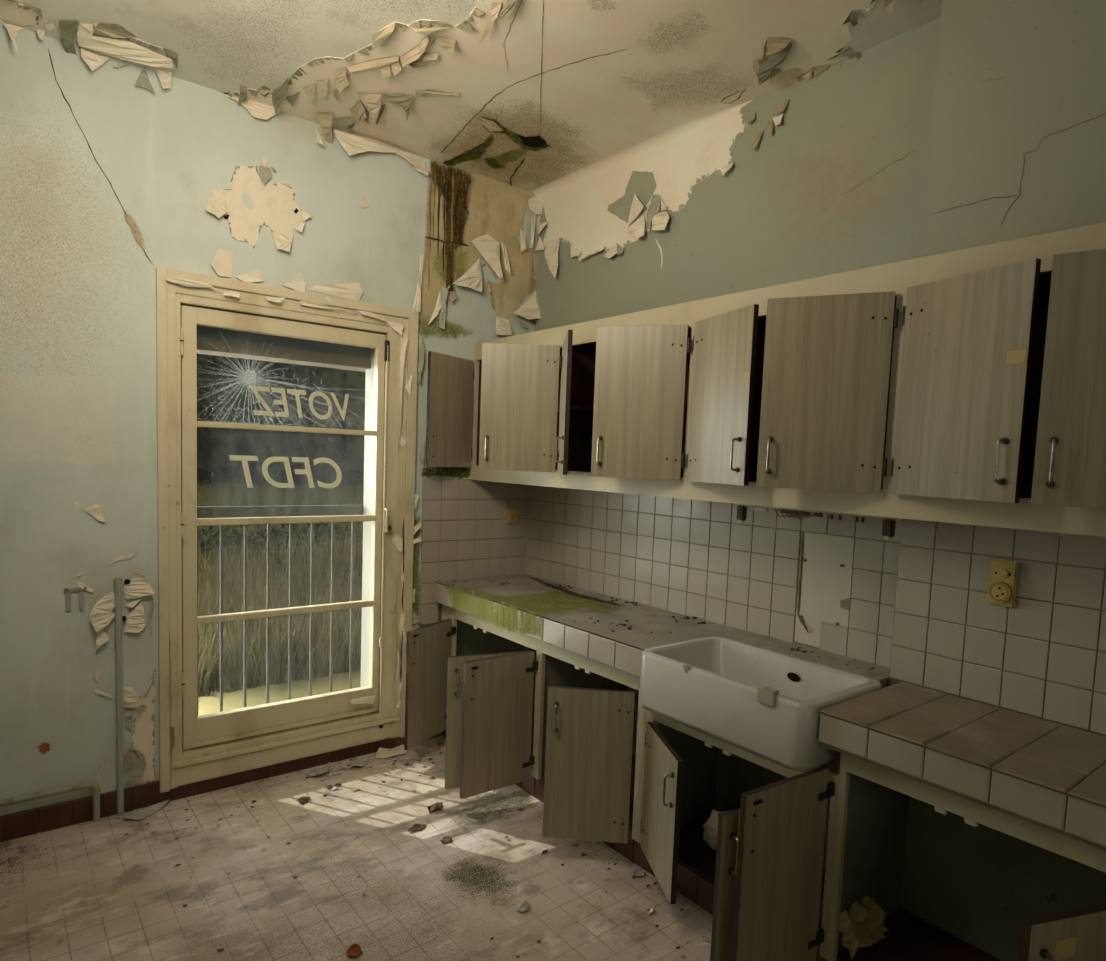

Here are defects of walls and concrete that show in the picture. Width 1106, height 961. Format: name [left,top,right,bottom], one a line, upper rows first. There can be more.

peeling [0,0,178,93]
crack [48,49,152,263]
peeling [165,153,311,298]
damp [411,97,601,340]
crack [441,0,626,153]
peeling [222,0,894,280]
crack [930,113,1106,225]
peeling [76,552,154,649]
peeling [794,532,855,647]
peeling [94,668,156,784]